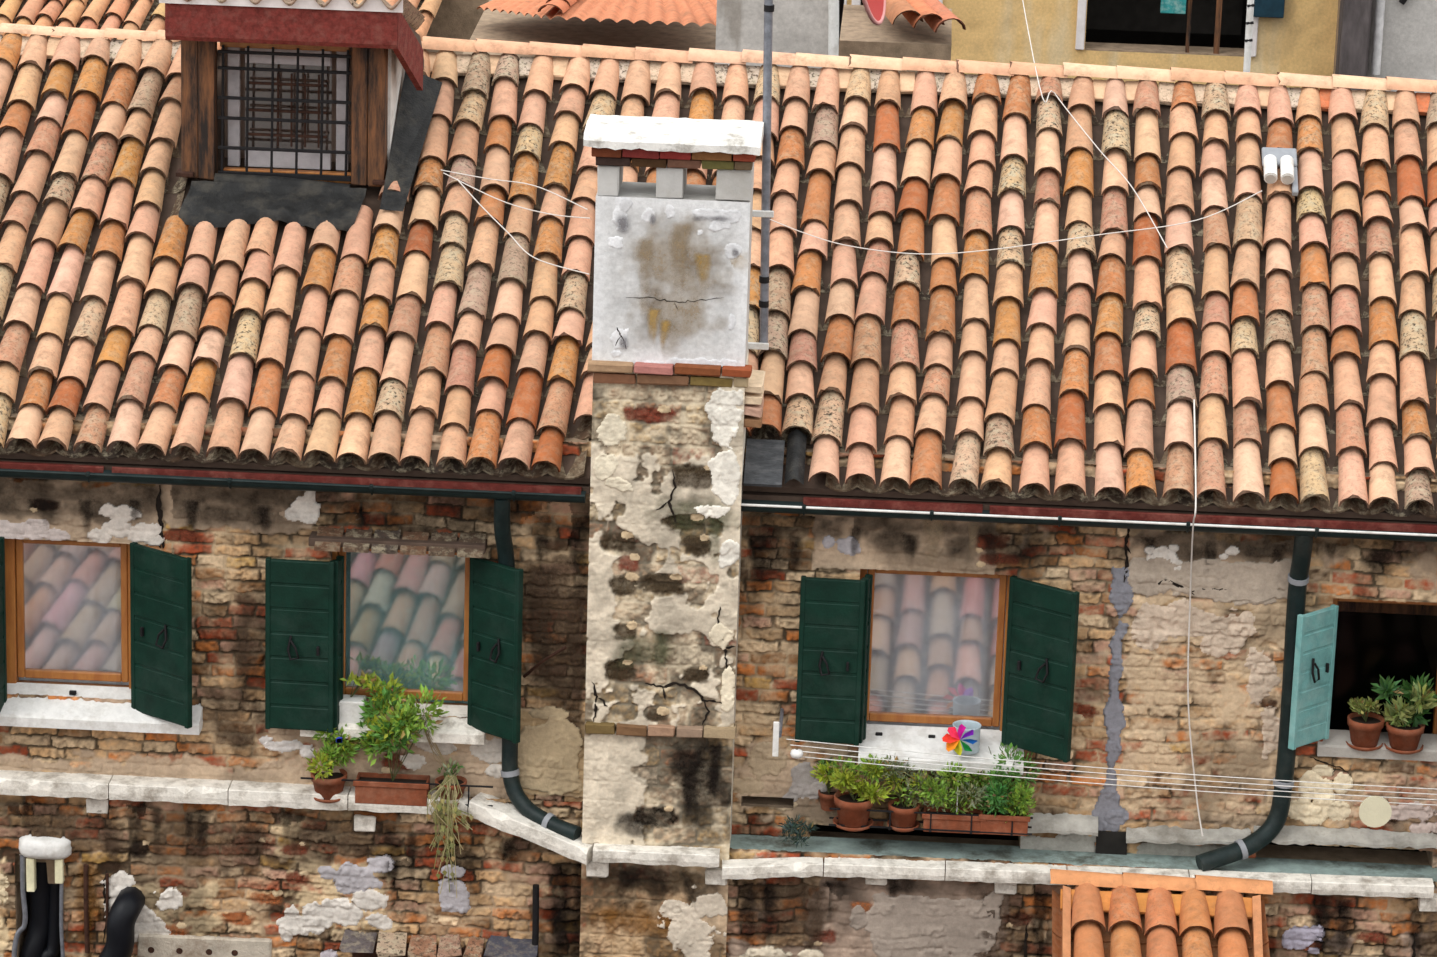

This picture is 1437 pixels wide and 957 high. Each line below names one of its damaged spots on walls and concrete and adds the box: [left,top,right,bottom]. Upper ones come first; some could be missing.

water stain [637,225,708,333]
peeling [0,499,200,546]
peeling [285,491,321,524]
peeling [593,405,676,493]
peeling [665,387,744,569]
spalling [600,530,685,596]
spalling [604,660,635,680]
peeling [684,665,735,712]
peeling [1127,544,1292,760]
peeling [155,886,187,935]
peeling [222,837,393,942]
peeling [657,884,727,957]